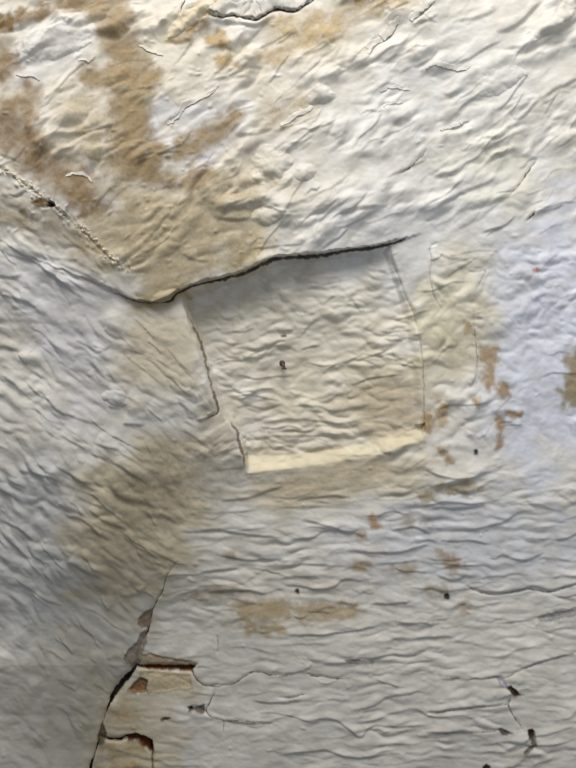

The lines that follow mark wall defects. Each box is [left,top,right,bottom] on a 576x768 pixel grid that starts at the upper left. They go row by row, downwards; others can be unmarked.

damp [0,8,48,32]
crack [211,0,313,21]
damp [0,50,19,81]
damp [59,0,242,188]
damp [0,80,107,220]
damp [106,183,259,287]
crack [162,239,405,303]
spalling [98,723,106,745]
crack [89,664,154,768]
spalling [128,733,153,750]